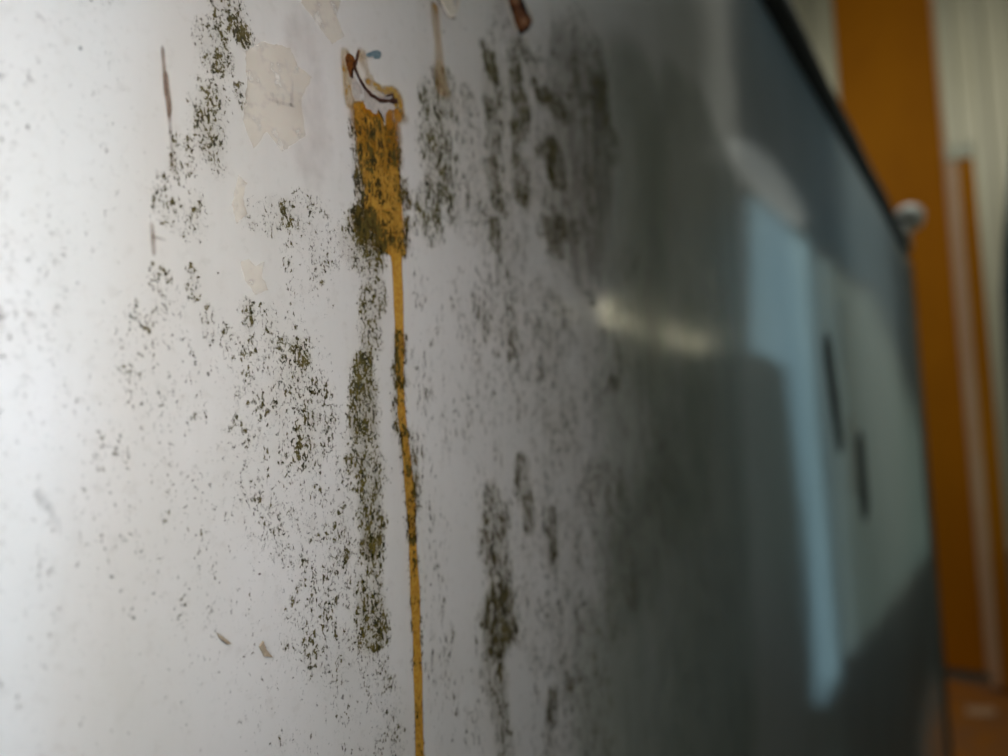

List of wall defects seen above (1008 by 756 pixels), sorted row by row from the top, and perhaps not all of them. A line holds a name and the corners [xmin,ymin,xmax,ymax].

water stain [140,0,255,243]
water stain [115,188,406,756]
peeling [345,50,398,126]
rust [342,64,425,756]
water stain [405,0,679,756]